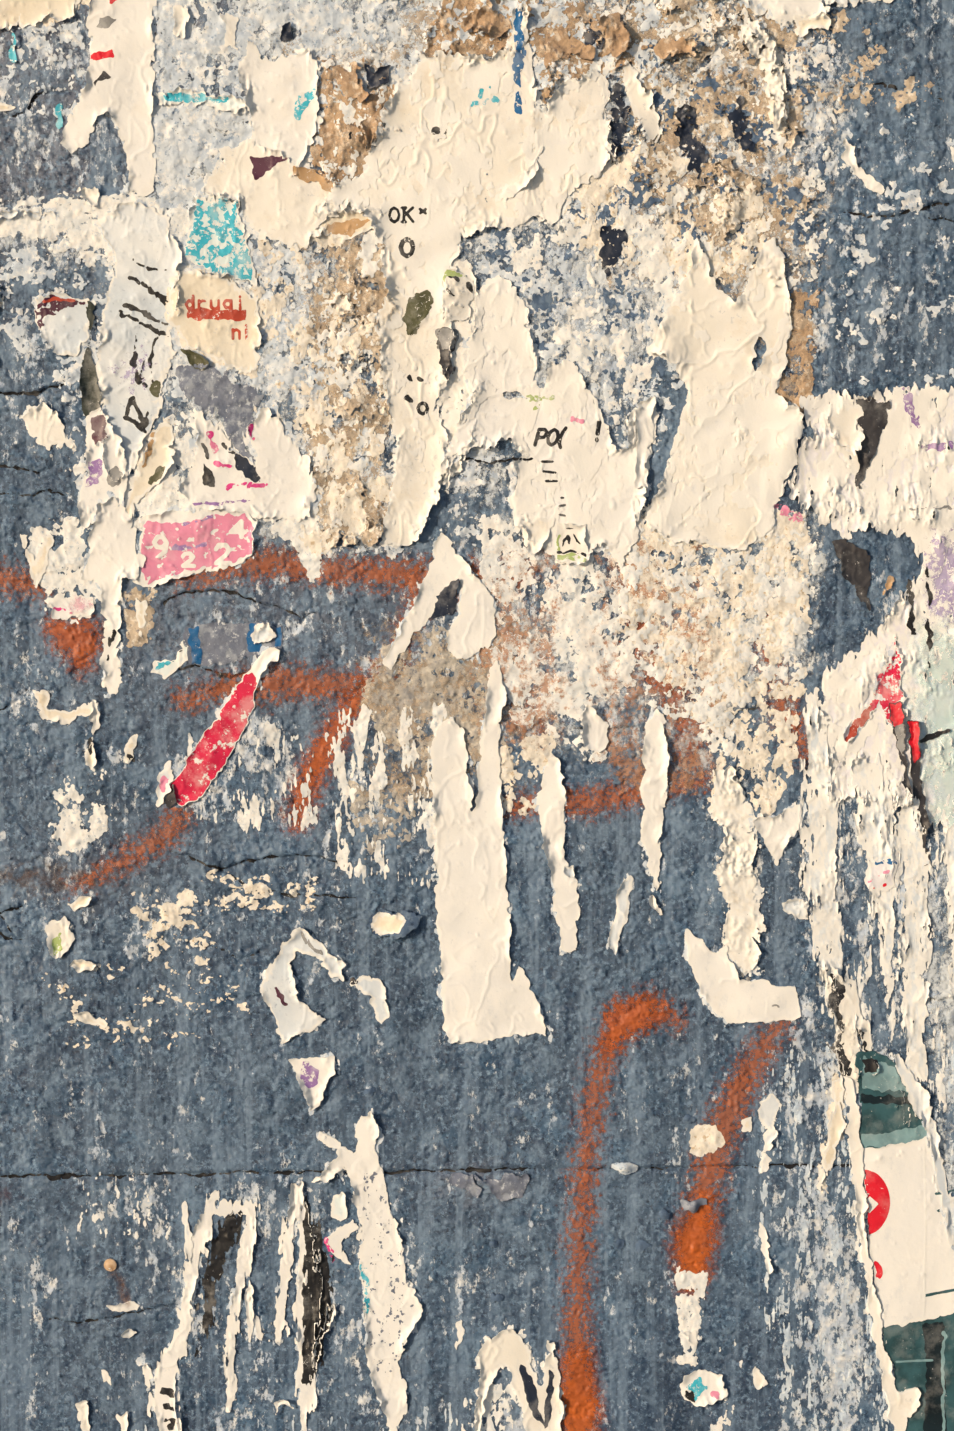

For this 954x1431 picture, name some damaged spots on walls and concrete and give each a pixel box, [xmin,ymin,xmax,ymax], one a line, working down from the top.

peeling [0,0,954,583]
peeling [23,511,102,624]
peeling [48,768,112,856]
peeling [197,438,954,1024]
peeling [42,869,319,1050]
peeling [106,1301,140,1312]
peeling [76,1172,171,1240]
peeling [416,1382,523,1431]
peeling [674,1266,735,1431]
peeling [689,1124,725,1157]
peeling [741,1042,889,1431]
peeling [888,998,954,1173]